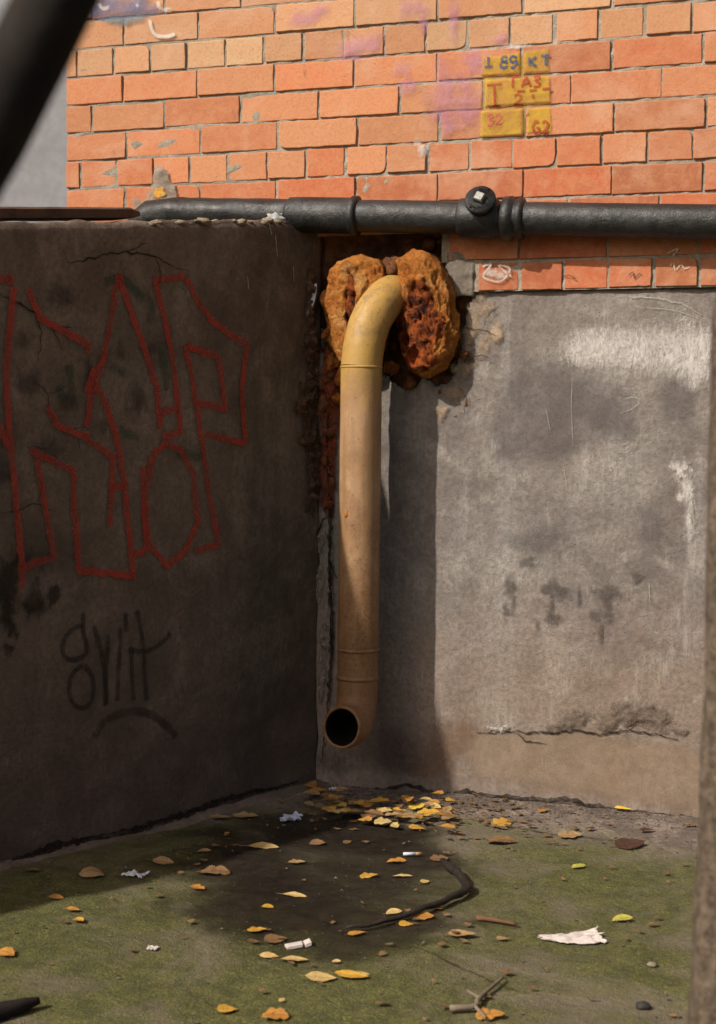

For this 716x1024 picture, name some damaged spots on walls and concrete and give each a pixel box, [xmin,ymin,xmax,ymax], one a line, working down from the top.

crack [63,243,188,284]
corrosion [318,347,348,518]
crack [476,720,678,744]